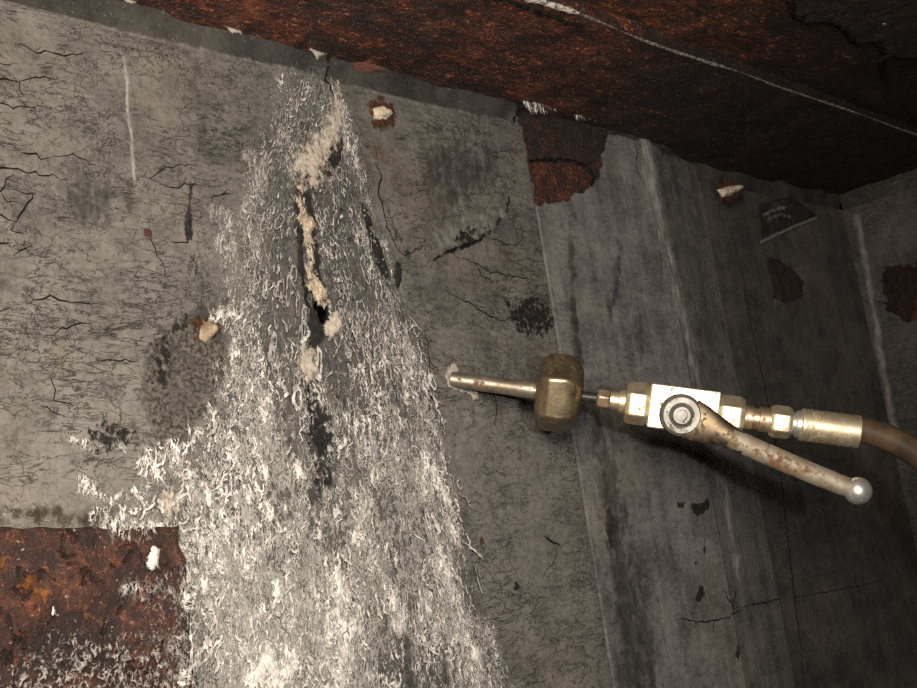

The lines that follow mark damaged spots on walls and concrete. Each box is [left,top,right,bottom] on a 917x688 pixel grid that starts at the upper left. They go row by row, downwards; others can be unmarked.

crack [0,44,83,109]
corrosion [368,96,395,130]
crack [0,152,90,256]
crack [151,164,231,198]
spalling [518,101,607,206]
corrosion [715,179,741,203]
crack [150,237,197,277]
crack [292,52,354,495]
crack [0,294,99,334]
damp [7,48,515,688]